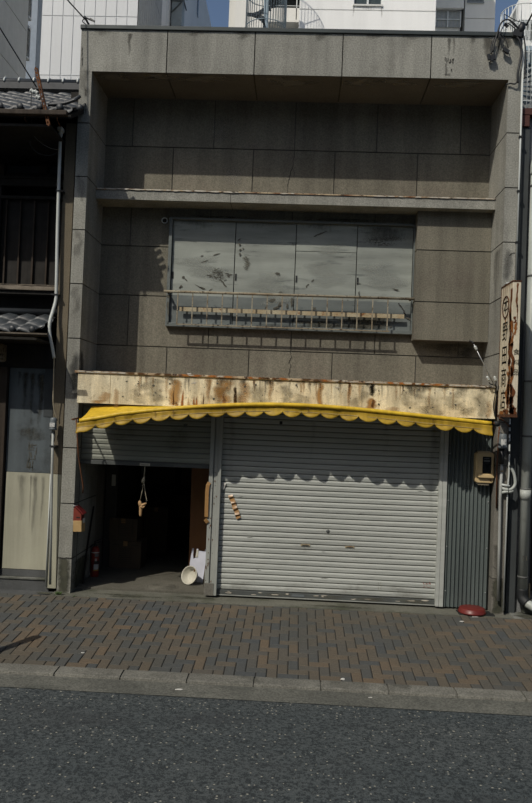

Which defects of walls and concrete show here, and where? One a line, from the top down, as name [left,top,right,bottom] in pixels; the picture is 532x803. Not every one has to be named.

corrosion [127,372,288,406]
corrosion [302,379,351,404]